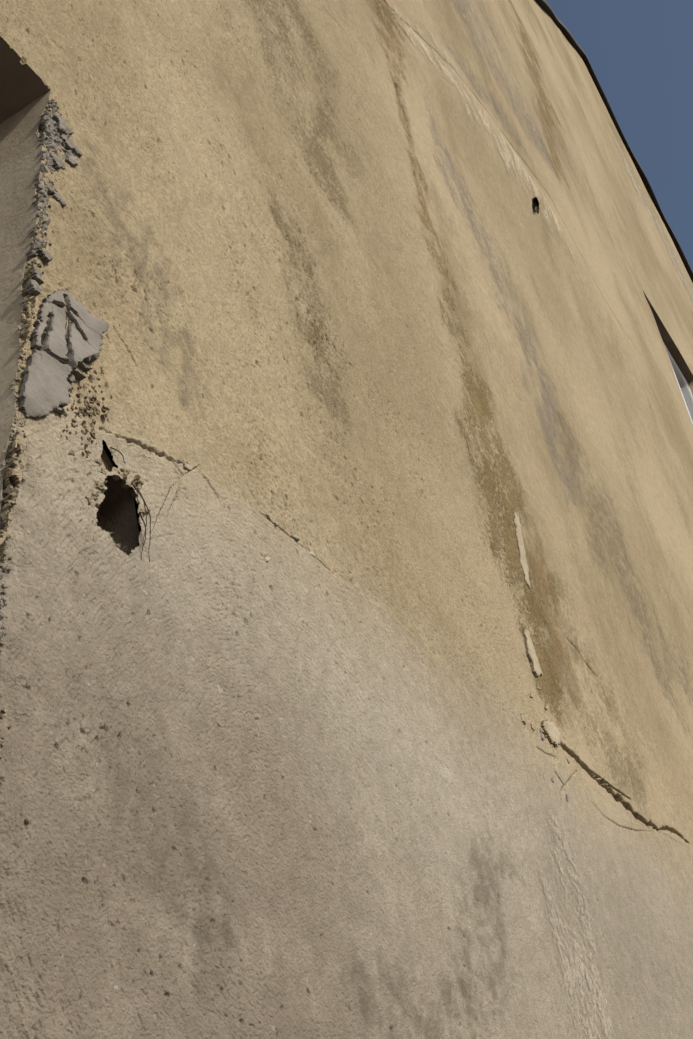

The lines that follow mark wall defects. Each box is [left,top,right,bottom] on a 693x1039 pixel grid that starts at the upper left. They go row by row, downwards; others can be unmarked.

damp [374,0,564,234]
spalling [0,99,112,652]
spalling [96,475,139,556]
crack [116,437,200,528]
crack [266,513,315,558]